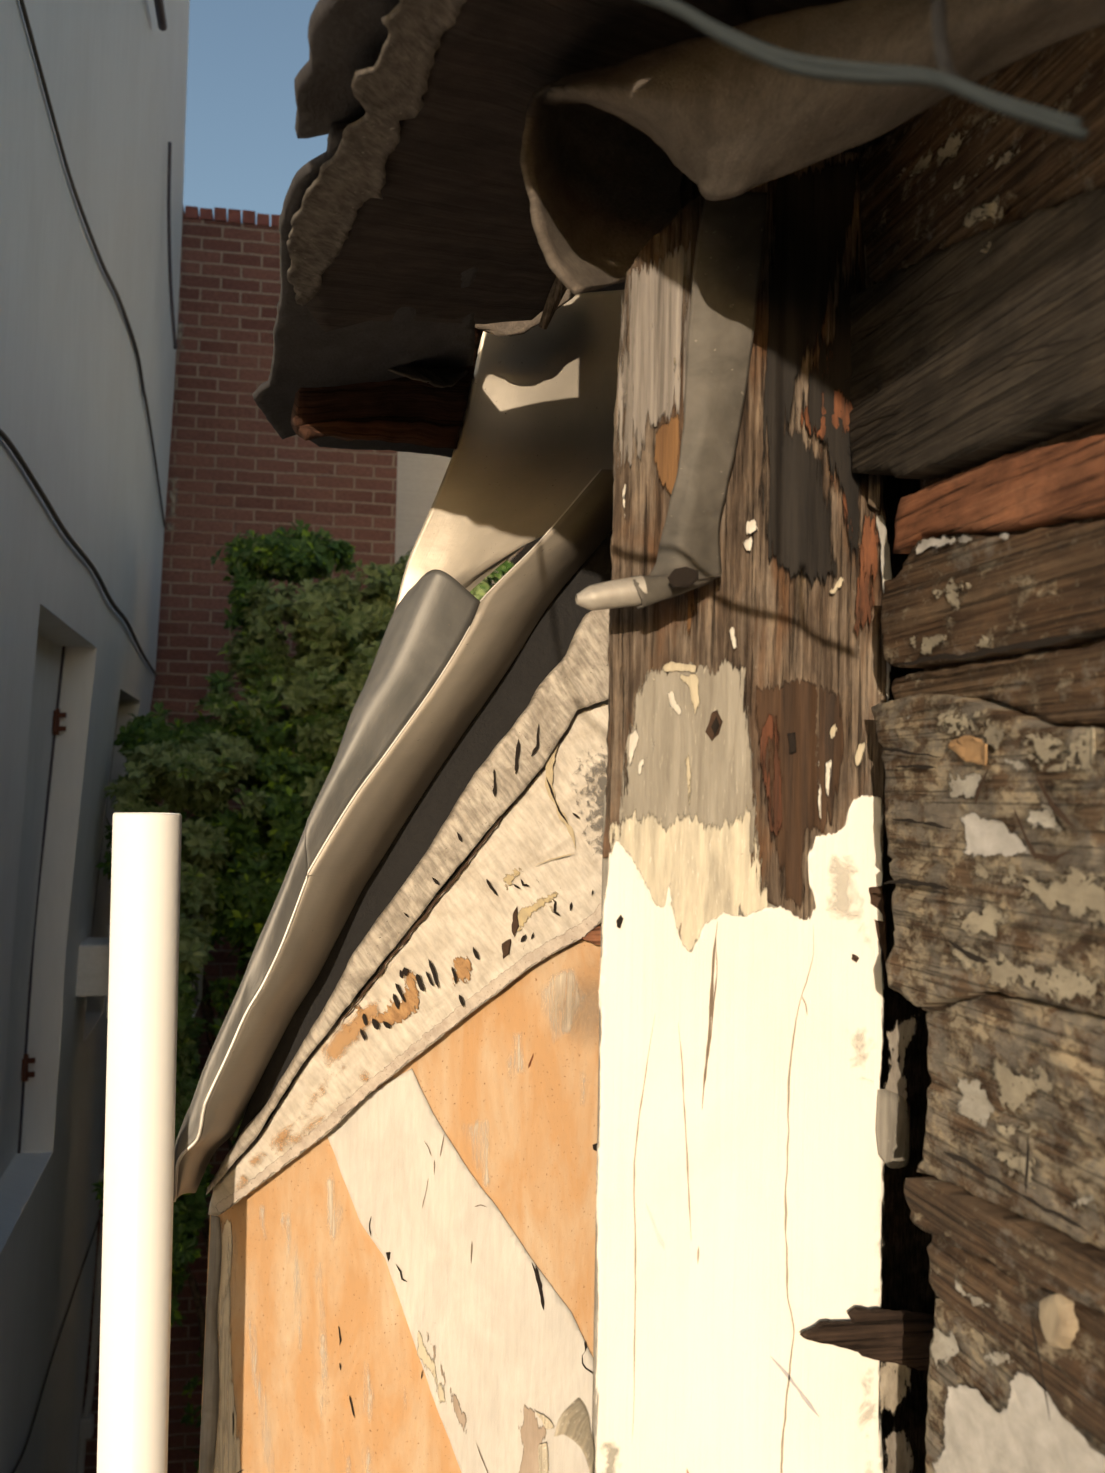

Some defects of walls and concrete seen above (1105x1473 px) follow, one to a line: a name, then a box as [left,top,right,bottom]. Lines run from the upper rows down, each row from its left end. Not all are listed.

peeling [614,240,696,517]
peeling [915,534,973,554]
peeling [619,627,865,909]
peeling [502,891,558,959]
peeling [869,885,887,962]
peeling [936,704,1105,1012]
crack [632,921,718,1436]
crack [780,931,814,1473]
peeling [930,1057,1057,1189]
peeling [519,1397,595,1473]
peeling [930,1327,959,1370]
peeling [932,1349,1105,1473]